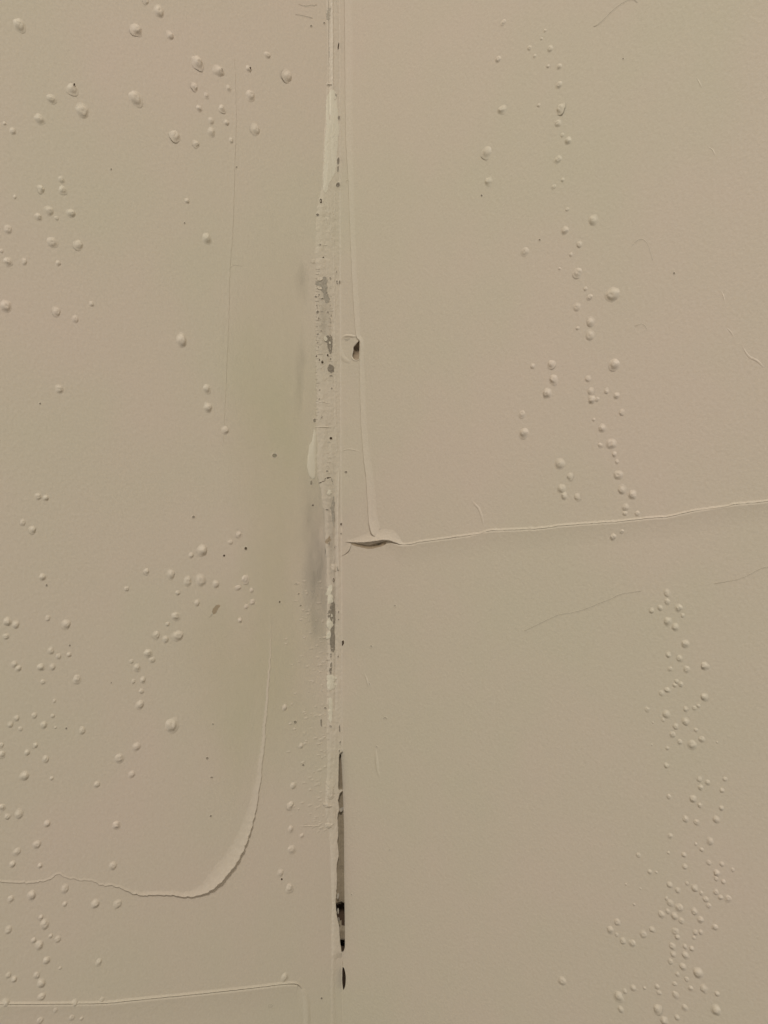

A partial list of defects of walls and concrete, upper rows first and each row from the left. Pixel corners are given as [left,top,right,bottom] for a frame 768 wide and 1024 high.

peeling [323,90,340,240]
spalling [324,335,334,373]
spalling [325,585,337,723]
crack [336,754,346,990]